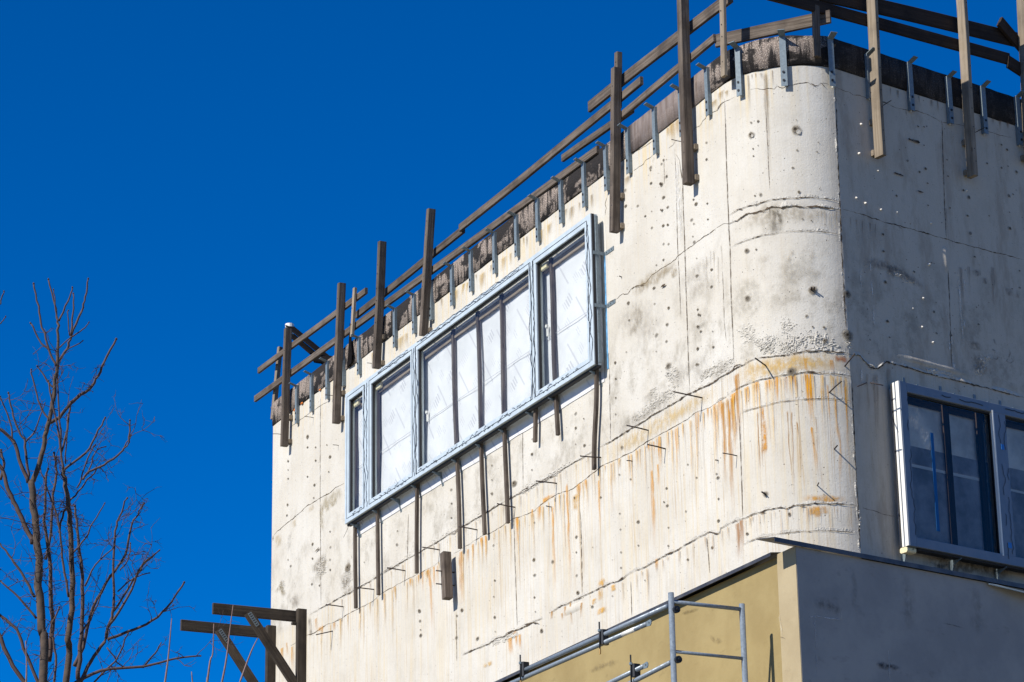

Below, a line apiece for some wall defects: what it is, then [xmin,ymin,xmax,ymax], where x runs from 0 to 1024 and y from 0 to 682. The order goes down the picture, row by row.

crack [608,194,1020,303]
crack [293,346,849,645]
rust [510,409,697,553]
rust [698,357,848,468]
crack [463,499,895,655]